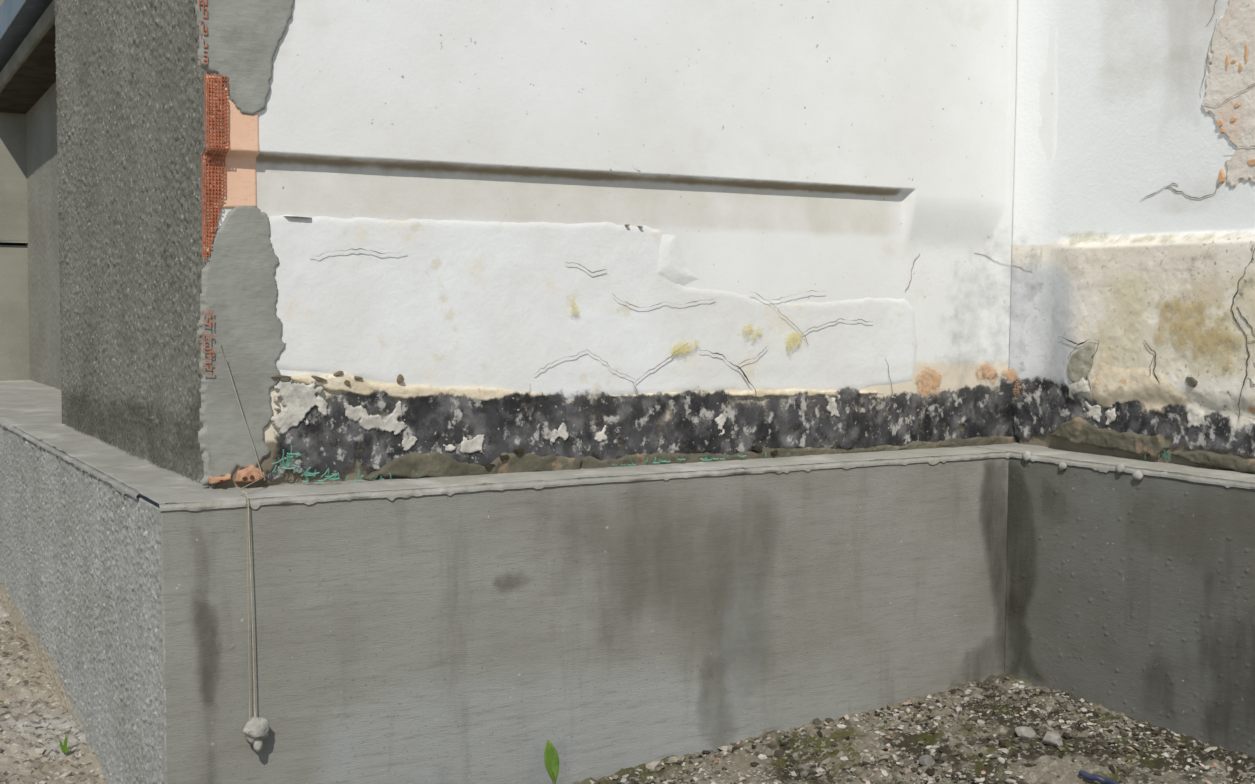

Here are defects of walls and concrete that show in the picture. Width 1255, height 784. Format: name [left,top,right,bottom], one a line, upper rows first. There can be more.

flaking render [1201,0,1255,188]
crack [1141,183,1220,200]
crack [753,290,873,344]
crack [1231,249,1255,420]
crack [541,343,766,404]
spalling [209,464,267,485]
damp [985,457,1255,758]